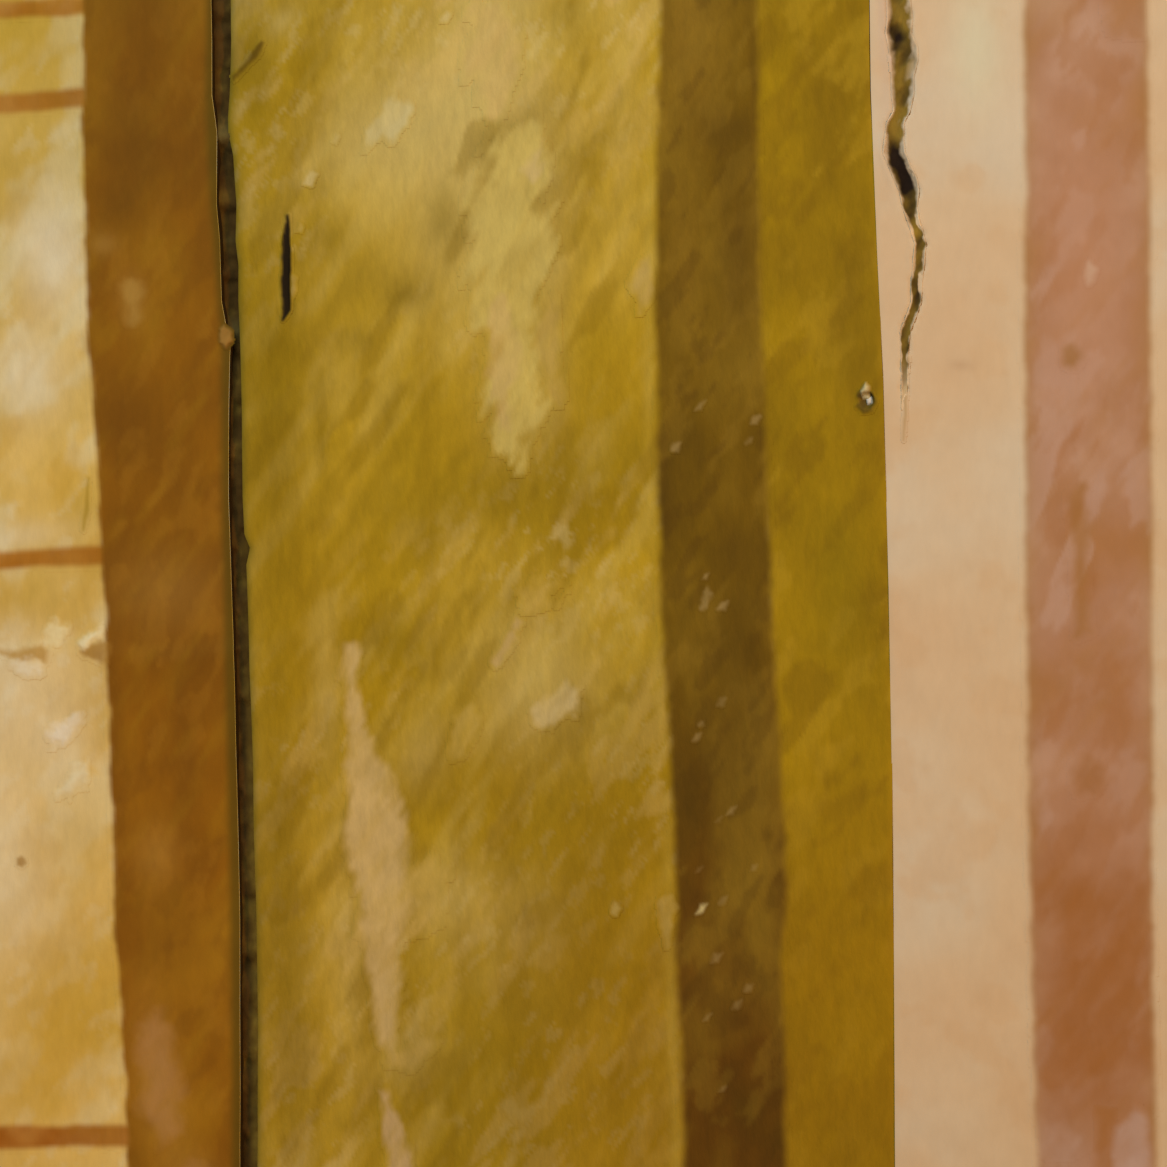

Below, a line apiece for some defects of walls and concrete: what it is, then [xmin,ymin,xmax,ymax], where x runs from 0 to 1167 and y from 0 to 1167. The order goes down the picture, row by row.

crack [213,0,267,1167]
crack [882,0,926,443]